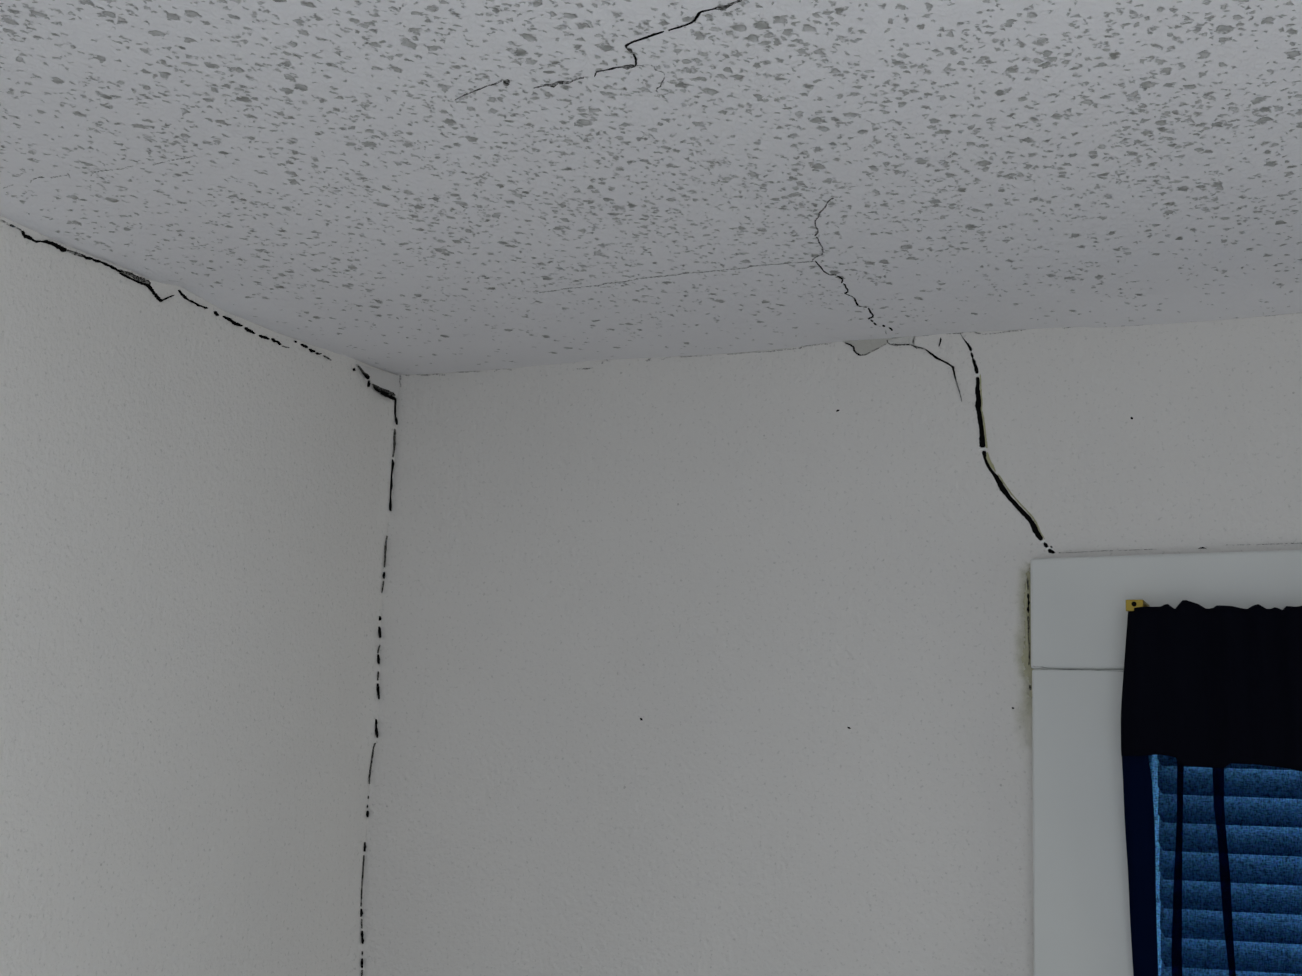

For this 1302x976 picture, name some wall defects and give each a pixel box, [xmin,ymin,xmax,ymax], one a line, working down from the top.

crack [455,0,742,100]
crack [539,198,1152,554]
crack [2,220,499,976]
crack [1027,580,1124,690]